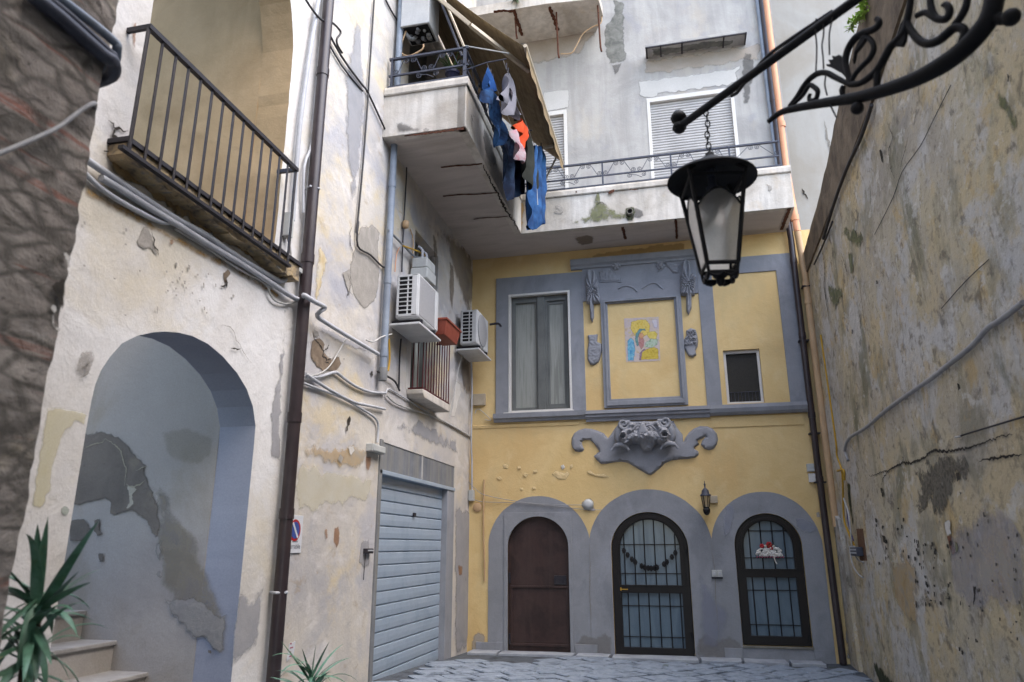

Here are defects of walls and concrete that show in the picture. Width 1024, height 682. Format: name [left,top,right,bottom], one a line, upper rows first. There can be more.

spalling [125,227,234,314]
peeling [343,225,379,308]
spalling [311,330,341,371]
peeling [70,432,161,559]
peeling [306,445,366,466]
crack [869,433,1022,488]